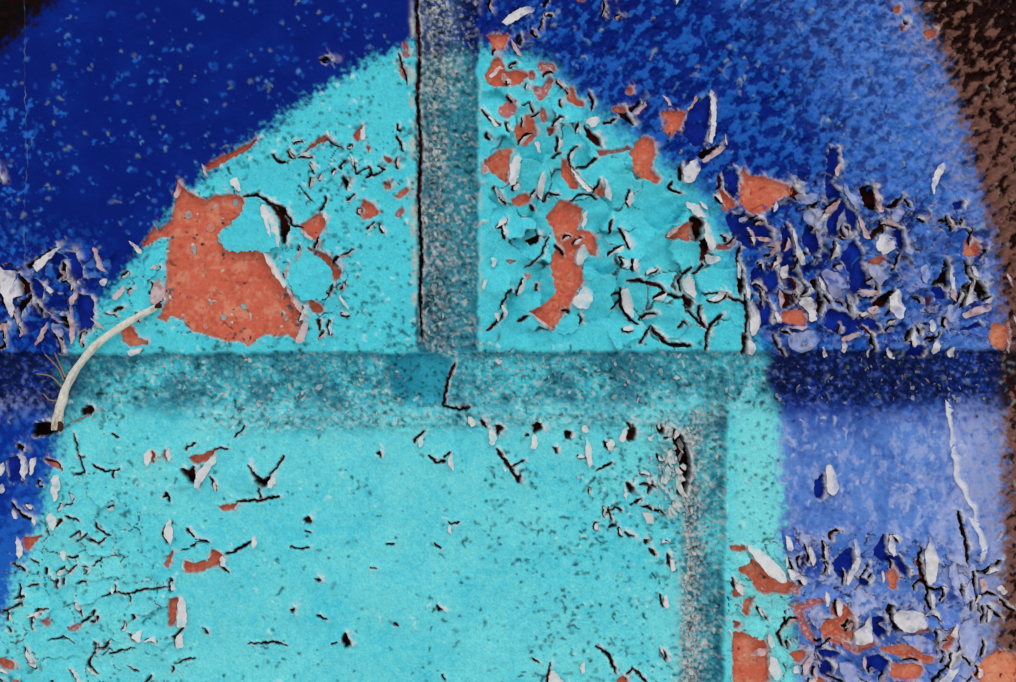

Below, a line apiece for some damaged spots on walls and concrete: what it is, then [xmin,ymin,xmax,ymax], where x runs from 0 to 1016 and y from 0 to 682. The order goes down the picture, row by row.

peeling [272,125,403,233]
peeling [481,0,992,404]
peeling [0,247,134,354]
peeling [129,177,364,413]
peeling [0,444,63,571]
peeling [183,442,227,492]
peeling [162,518,257,572]
peeling [222,456,285,510]
crack [414,431,454,471]
crack [443,363,524,482]
spalling [593,422,700,682]
peeling [728,529,1016,682]